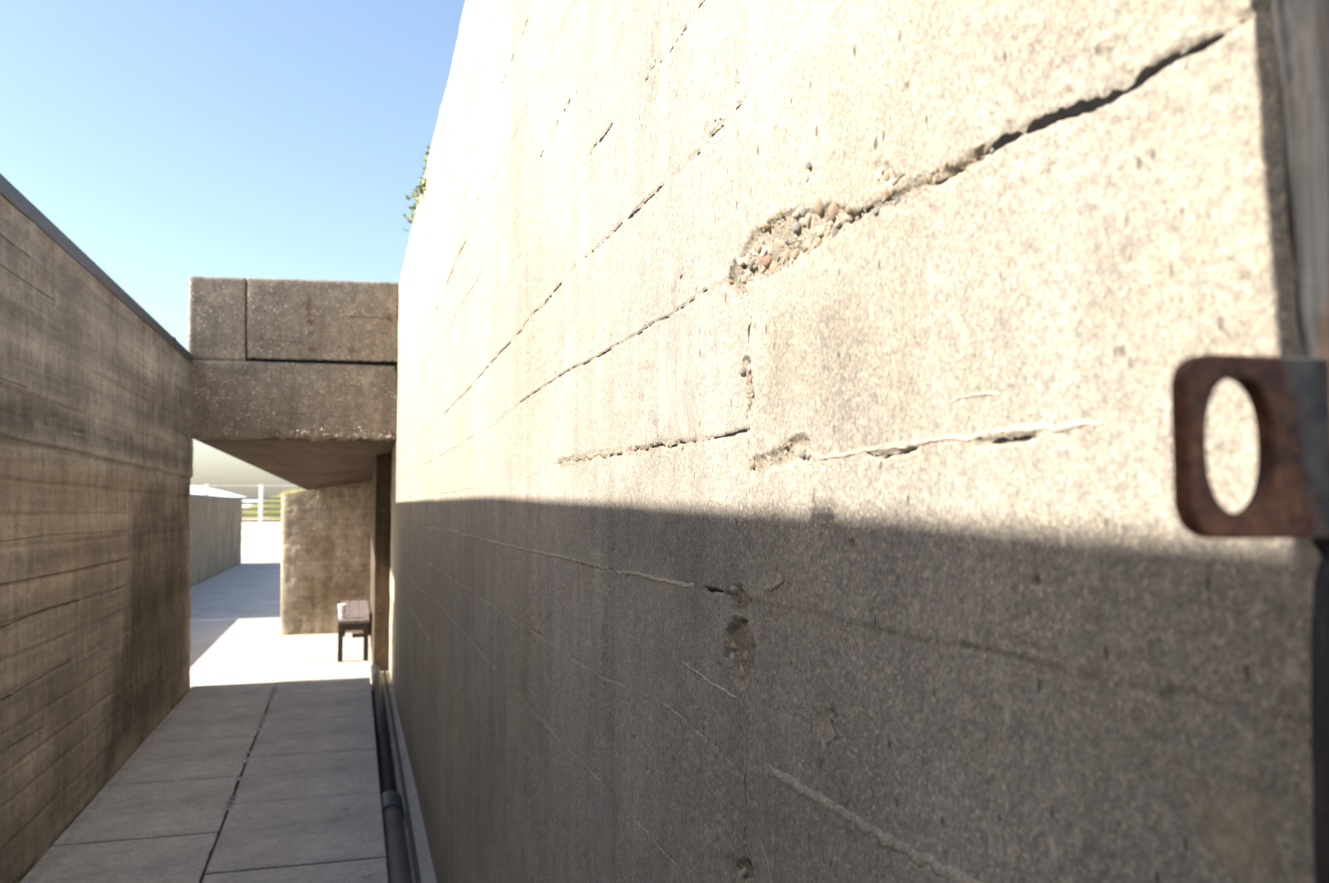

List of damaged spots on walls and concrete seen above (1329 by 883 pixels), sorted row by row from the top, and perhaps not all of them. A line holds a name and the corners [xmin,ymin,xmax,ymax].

crack [938,17,1248,185]
spalling [728,141,998,300]
crack [875,449,917,459]
crack [992,435,1033,444]
spalling [725,570,783,690]